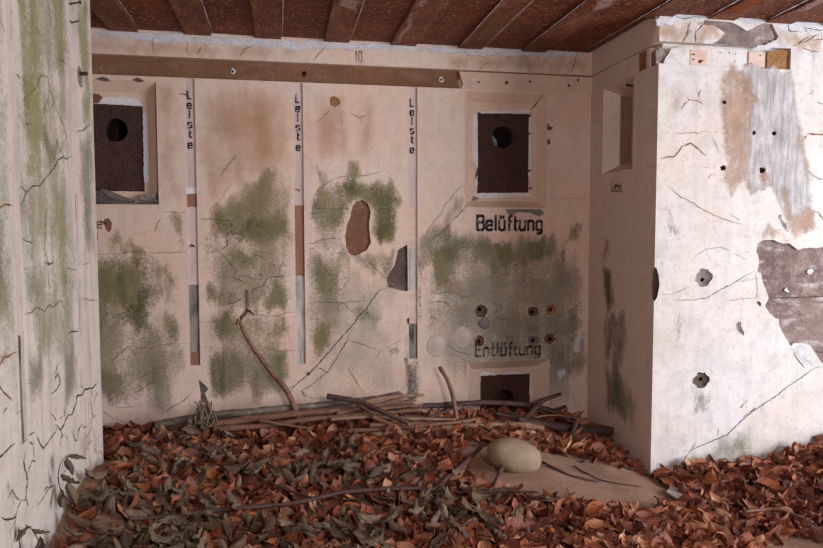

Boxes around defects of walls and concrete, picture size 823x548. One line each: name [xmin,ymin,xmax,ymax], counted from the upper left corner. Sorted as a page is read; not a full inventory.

flaking render [656,14,823,46]
leakage [723,65,815,235]
crack [0,155,73,209]
flaking render [345,200,371,256]
leakage [133,289,149,332]
crack [146,156,397,400]
flaking render [386,245,408,291]
leakage [433,239,468,285]
flaking render [756,240,823,364]
crack [0,336,183,523]
leakage [404,358,418,403]
crack [681,349,822,464]